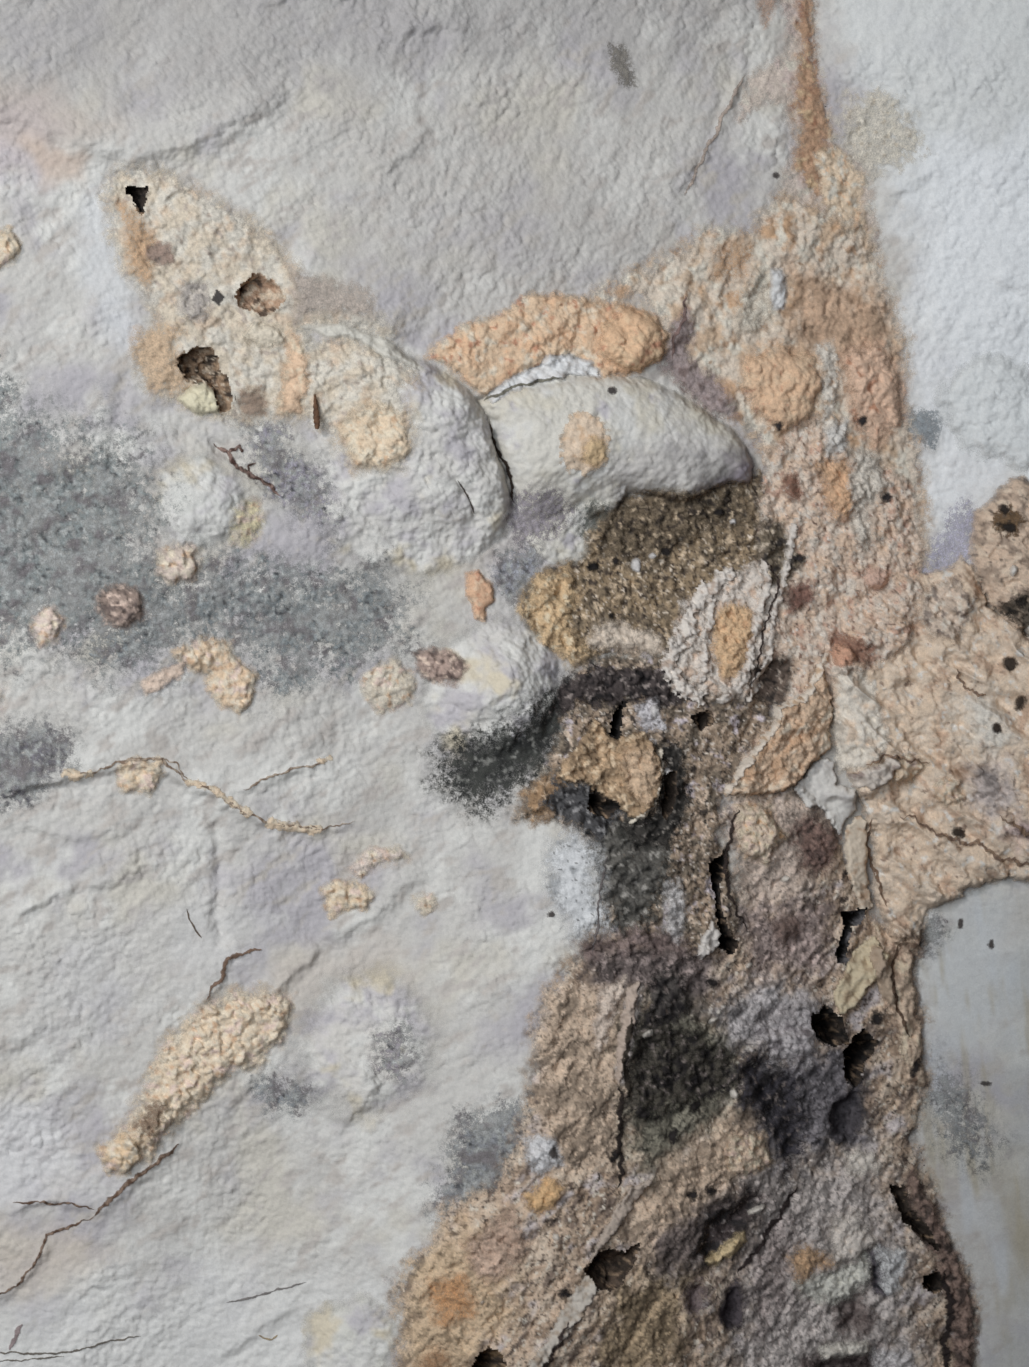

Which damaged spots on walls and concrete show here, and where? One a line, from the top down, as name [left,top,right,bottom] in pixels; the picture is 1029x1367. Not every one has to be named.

corrosion [738,0,878,254]
leakage [0,375,420,694]
spalling [999,504,1016,532]
leakage [0,717,79,811]
crack [61,755,353,836]
leakage [421,675,575,820]
flaking render [388,340,980,1367]
crack [0,1144,179,1294]
crack [0,1324,141,1362]
crack [938,1271,957,1367]